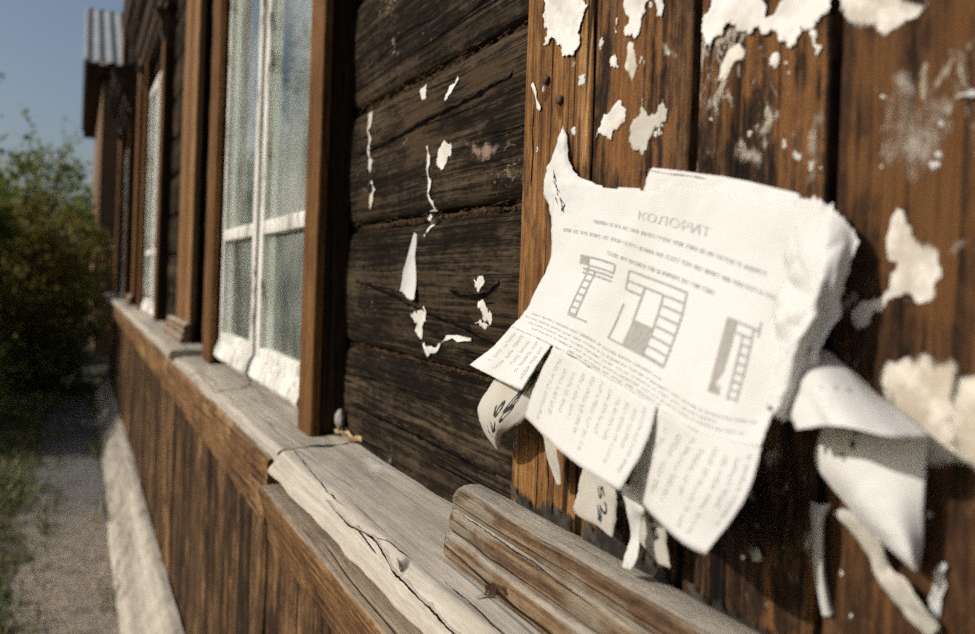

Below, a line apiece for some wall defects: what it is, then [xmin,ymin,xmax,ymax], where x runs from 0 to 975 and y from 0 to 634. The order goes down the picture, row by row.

crack [359,71,512,155]
crack [289,446,504,634]